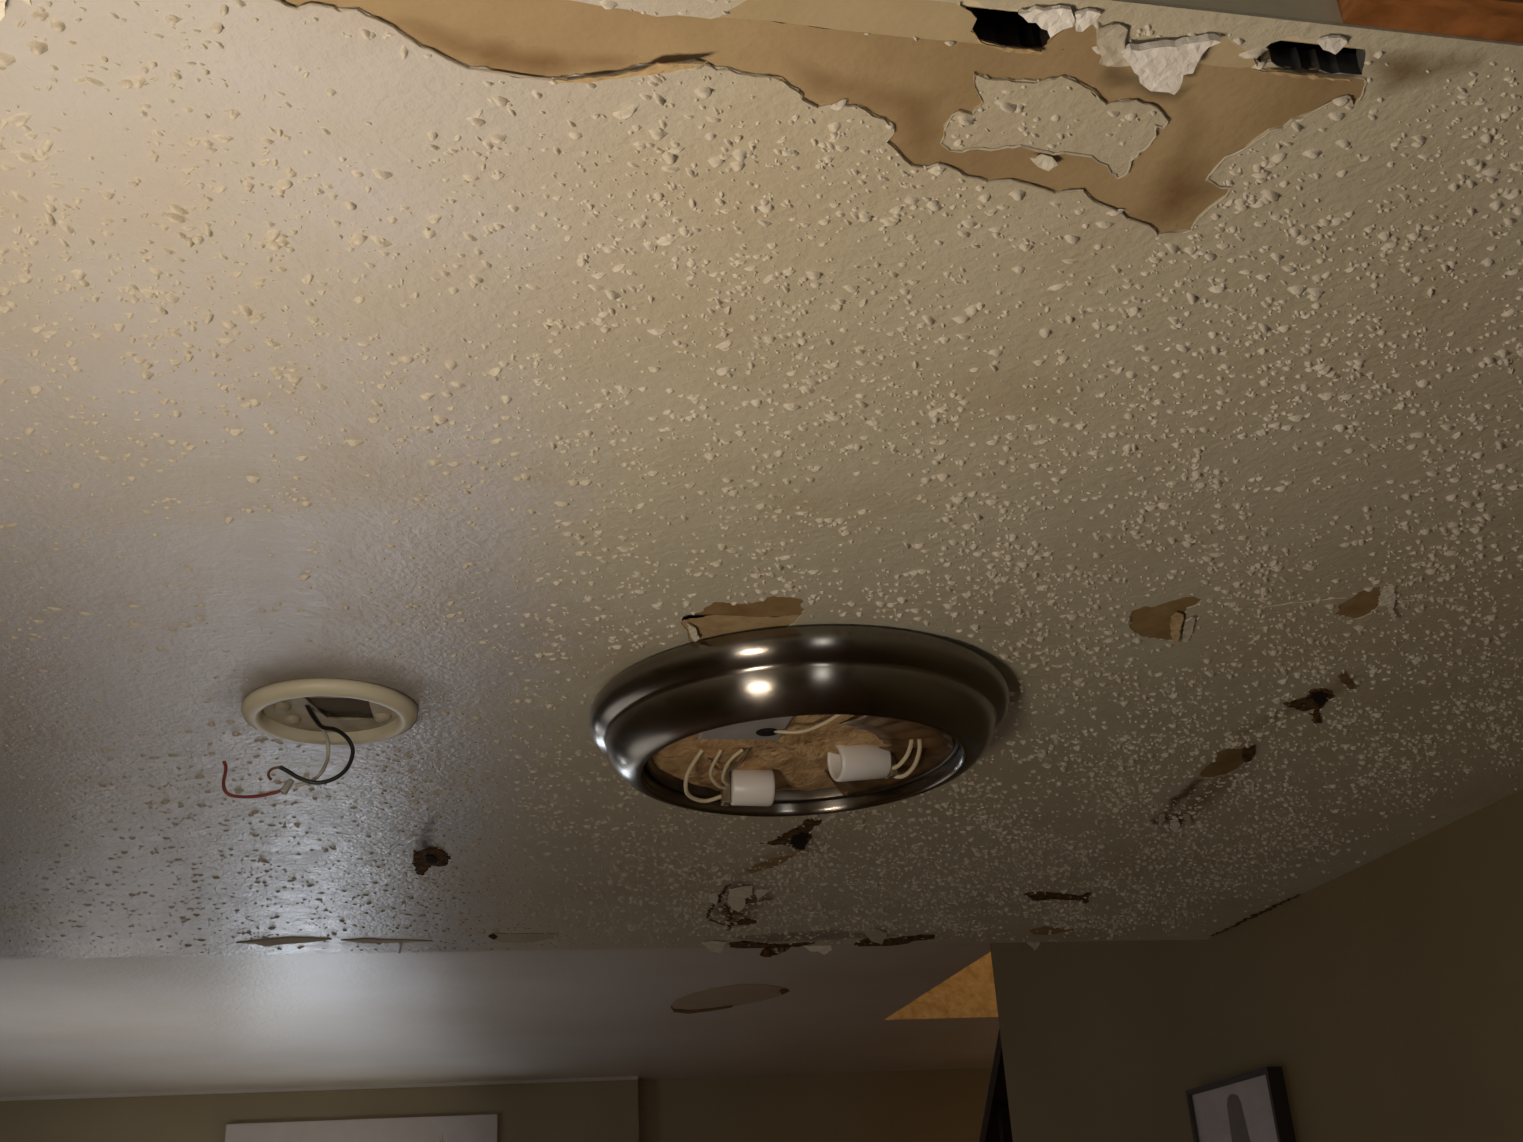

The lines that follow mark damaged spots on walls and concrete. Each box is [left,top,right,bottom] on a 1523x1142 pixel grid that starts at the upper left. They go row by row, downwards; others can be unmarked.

peeling [0,0,32,21]
peeling [272,0,1368,236]
peeling [681,596,805,642]
peeling [1129,597,1201,645]
peeling [1335,586,1396,621]
peeling [1153,744,1256,832]
spalling [412,848,451,876]
crack [701,884,935,957]
peeling [670,984,789,1014]